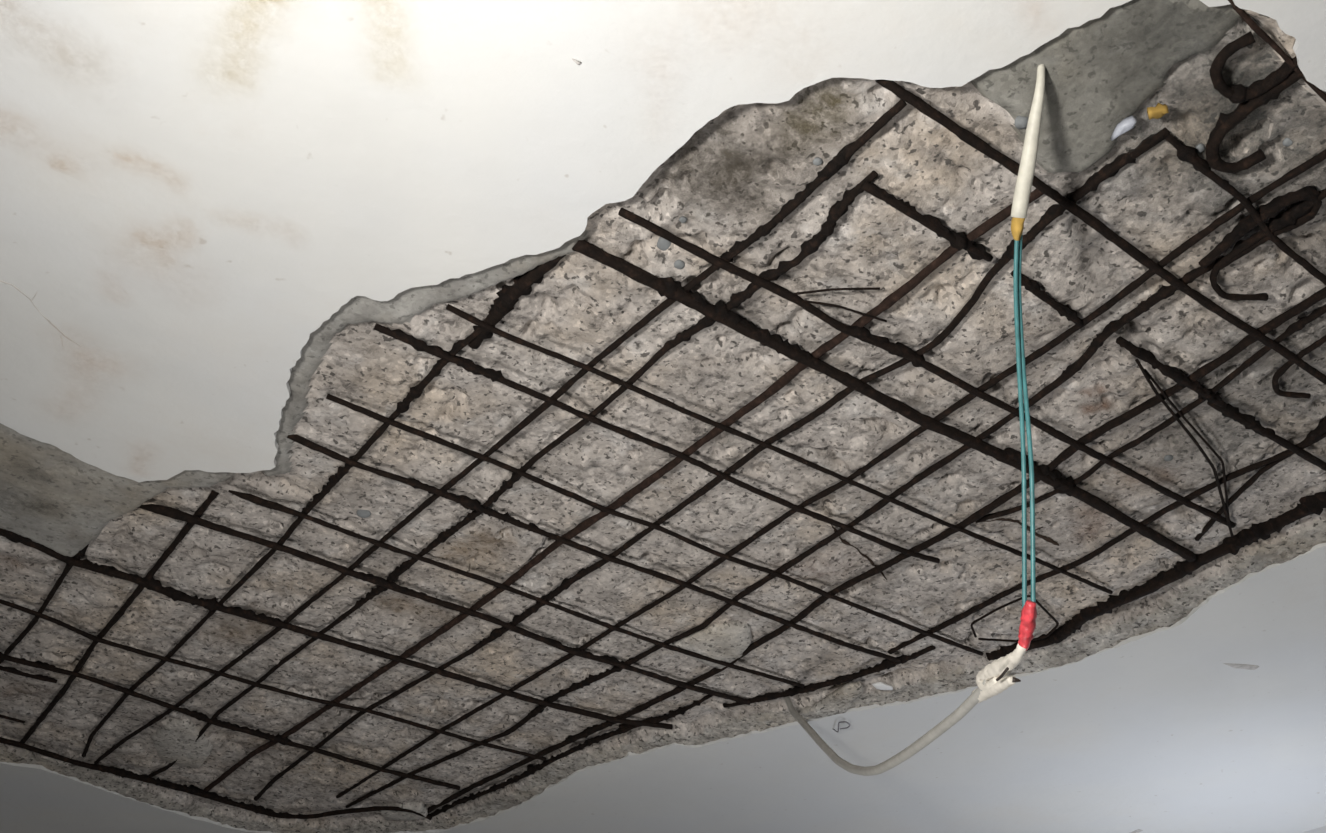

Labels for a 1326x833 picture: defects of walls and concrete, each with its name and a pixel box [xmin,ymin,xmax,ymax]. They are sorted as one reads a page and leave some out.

spalling [0,394,1022,833]
spalling [0,0,1326,595]
spalling [448,326,1022,633]
spalling [1002,285,1326,678]